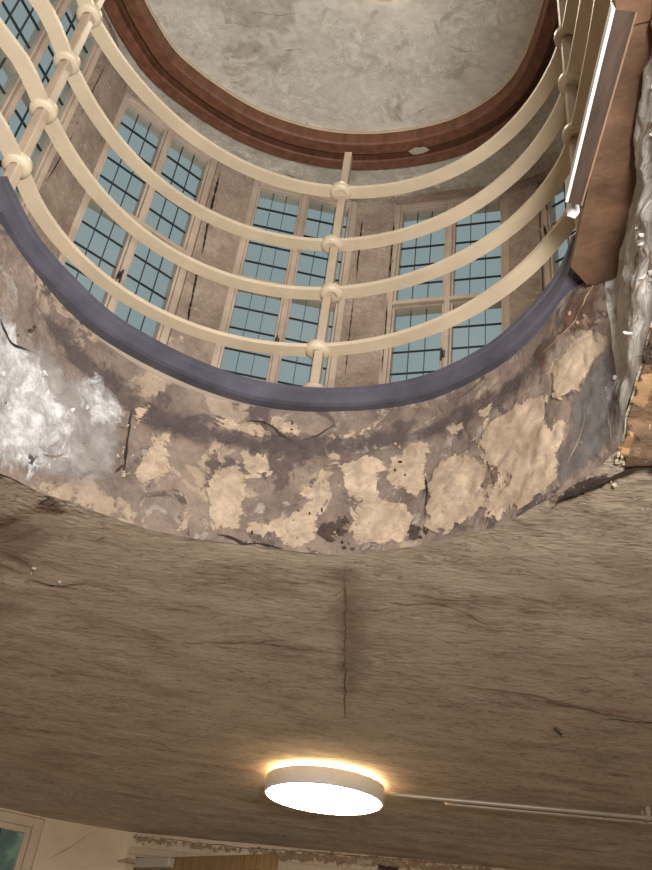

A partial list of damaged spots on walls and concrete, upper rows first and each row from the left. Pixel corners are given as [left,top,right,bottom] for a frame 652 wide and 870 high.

efflorescence [0,316,121,479]
peeling [134,406,155,421]
peeling [135,432,172,486]
peeling [205,330,596,549]
peeling [617,431,635,458]
peeling [631,325,652,407]
crack [198,561,362,711]
peeling [133,834,507,870]